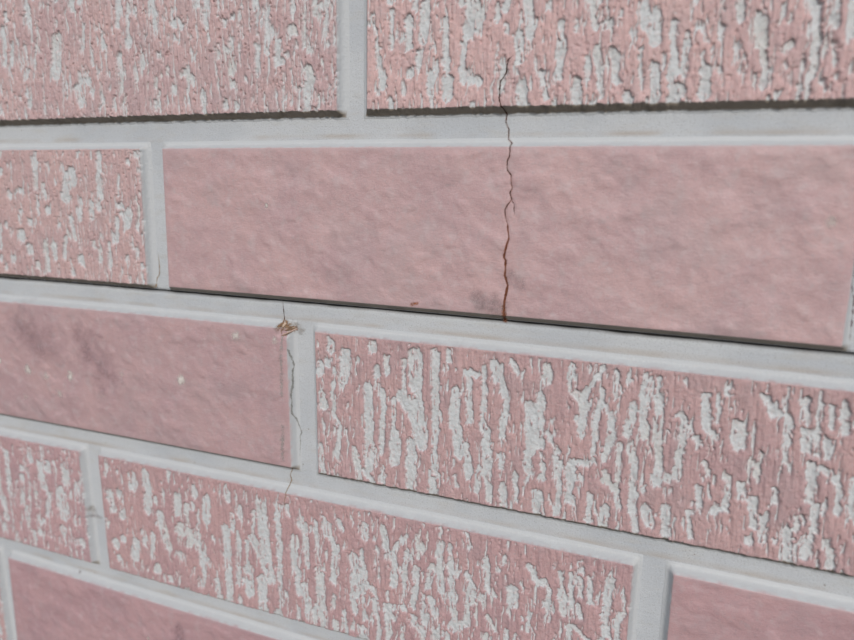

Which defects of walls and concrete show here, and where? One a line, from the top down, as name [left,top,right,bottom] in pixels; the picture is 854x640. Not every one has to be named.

crack [498,57,514,320]
crack [287,349,302,448]